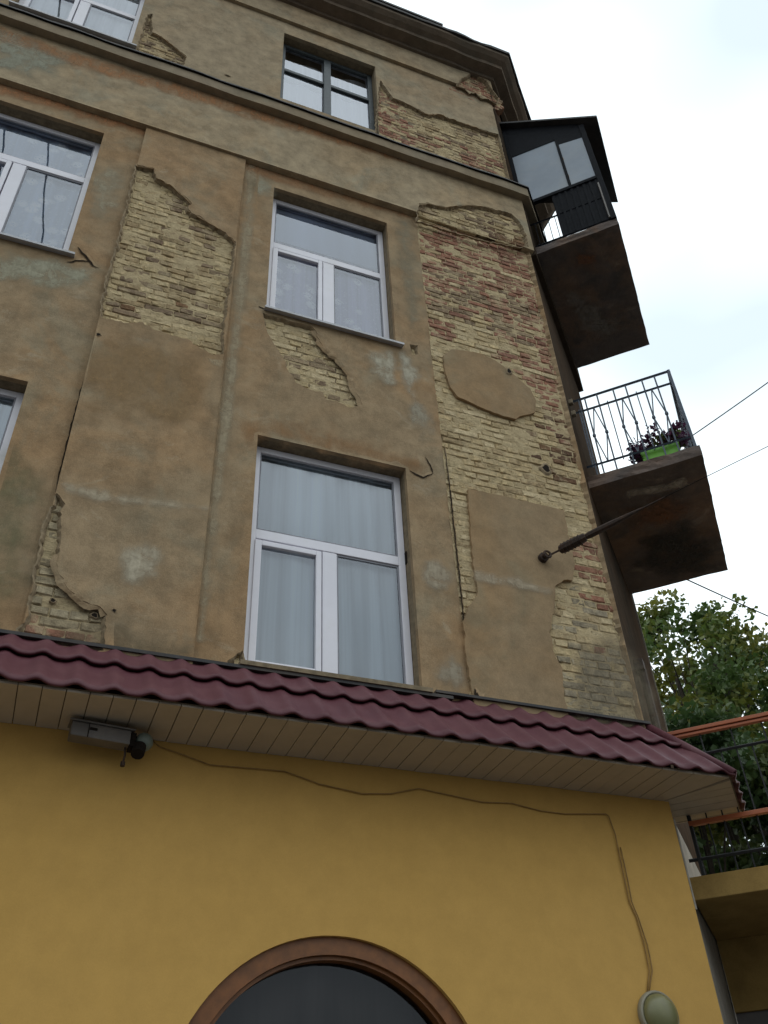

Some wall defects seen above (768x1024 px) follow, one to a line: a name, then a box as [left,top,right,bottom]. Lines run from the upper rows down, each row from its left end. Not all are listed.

flaking render [136,15,186,65]
flaking render [374,81,509,179]
flaking render [448,74,504,116]
flaking render [100,163,238,355]
flaking render [263,313,362,408]
crack [56,380,84,489]
flaking render [410,203,641,741]
flaking render [16,494,117,651]
crack [411,447,465,620]